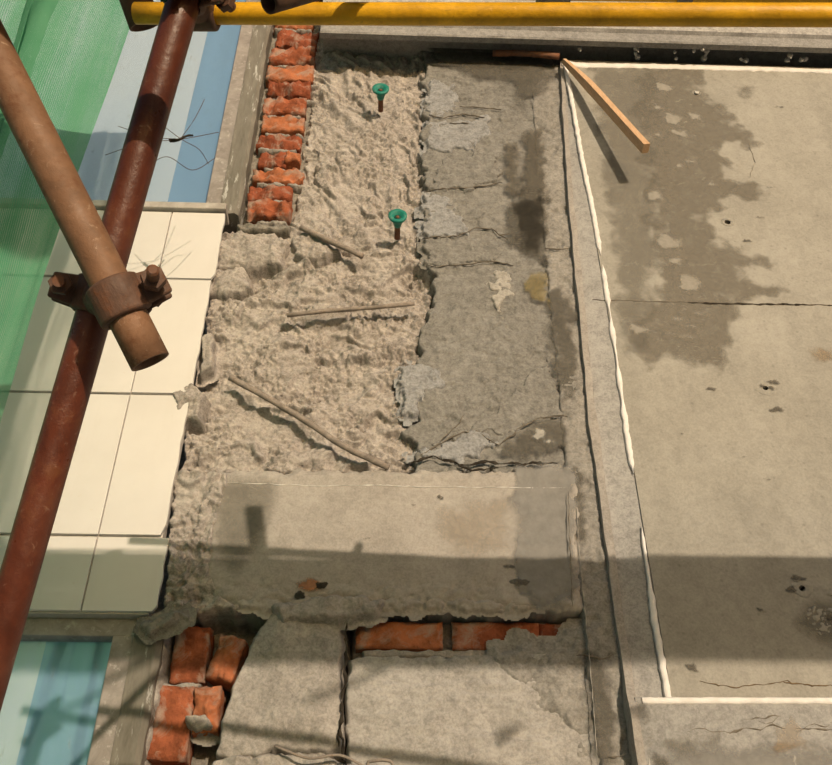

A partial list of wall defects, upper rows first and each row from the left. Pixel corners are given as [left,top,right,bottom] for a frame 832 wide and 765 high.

crack [430,106,501,124]
crack [424,182,502,192]
leakage [504,128,551,264]
leakage [595,68,778,364]
crack [424,227,509,239]
crack [428,260,514,268]
crack [592,298,832,306]
spalling [133,25,565,765]
crack [701,680,832,688]
crack [688,715,832,734]